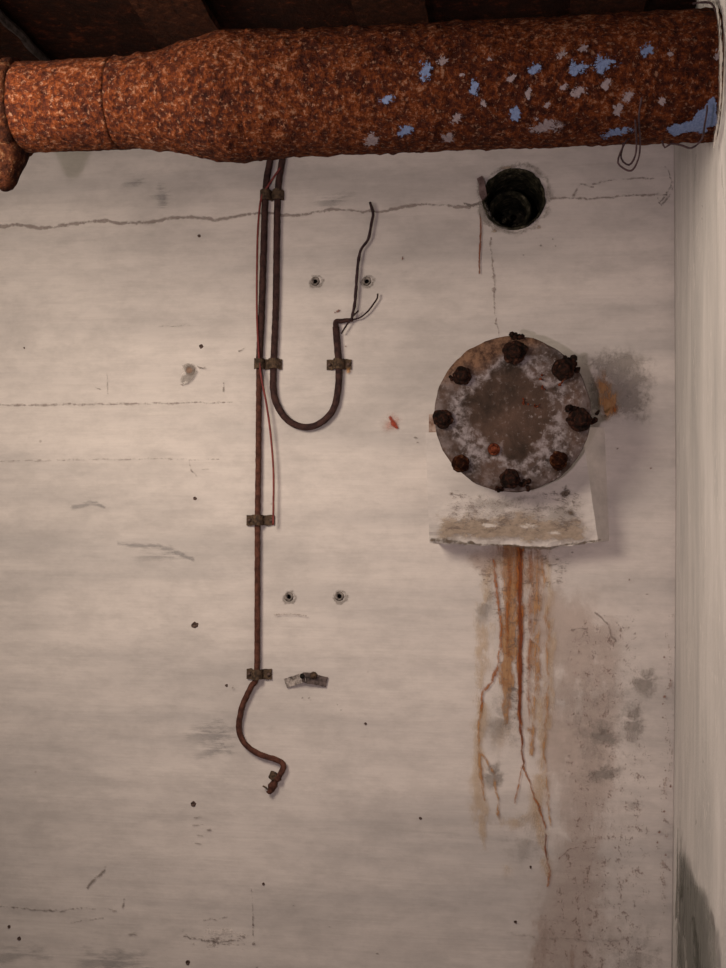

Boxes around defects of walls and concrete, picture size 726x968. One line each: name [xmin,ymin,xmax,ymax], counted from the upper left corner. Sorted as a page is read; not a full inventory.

crack [0,201,482,230]
crack [550,171,670,204]
rust [477,544,551,887]
water stain [675,848,715,968]